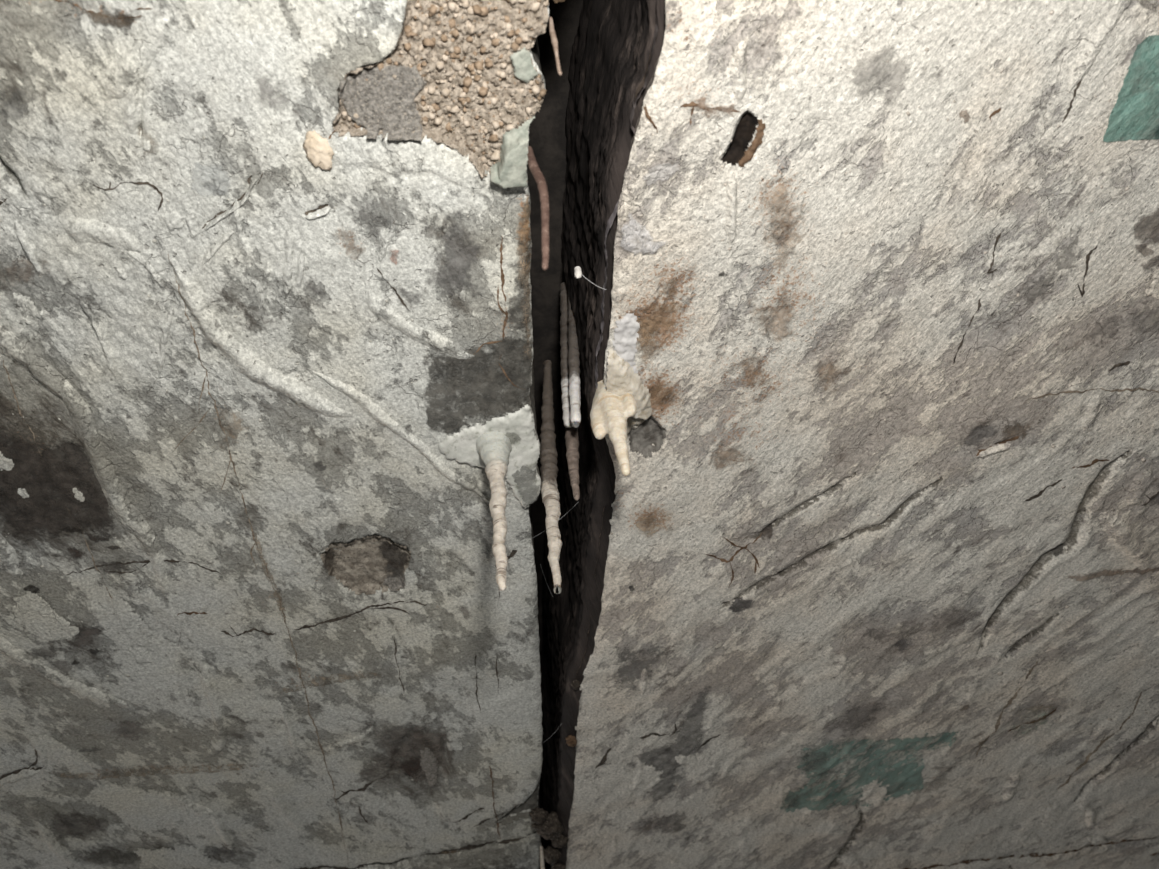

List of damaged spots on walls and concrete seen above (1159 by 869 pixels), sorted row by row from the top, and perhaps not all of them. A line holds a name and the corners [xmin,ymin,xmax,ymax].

spalling [332,0,549,189]
crack [644,104,658,133]
crack [680,101,740,125]
water stain [424,254,541,509]
water stain [606,313,653,434]
crack [1025,459,1109,501]
crack [67,509,222,599]
crack [168,239,537,869]
crack [706,533,762,588]
crack [595,748,611,769]
crack [640,724,721,748]
crack [974,662,1057,758]